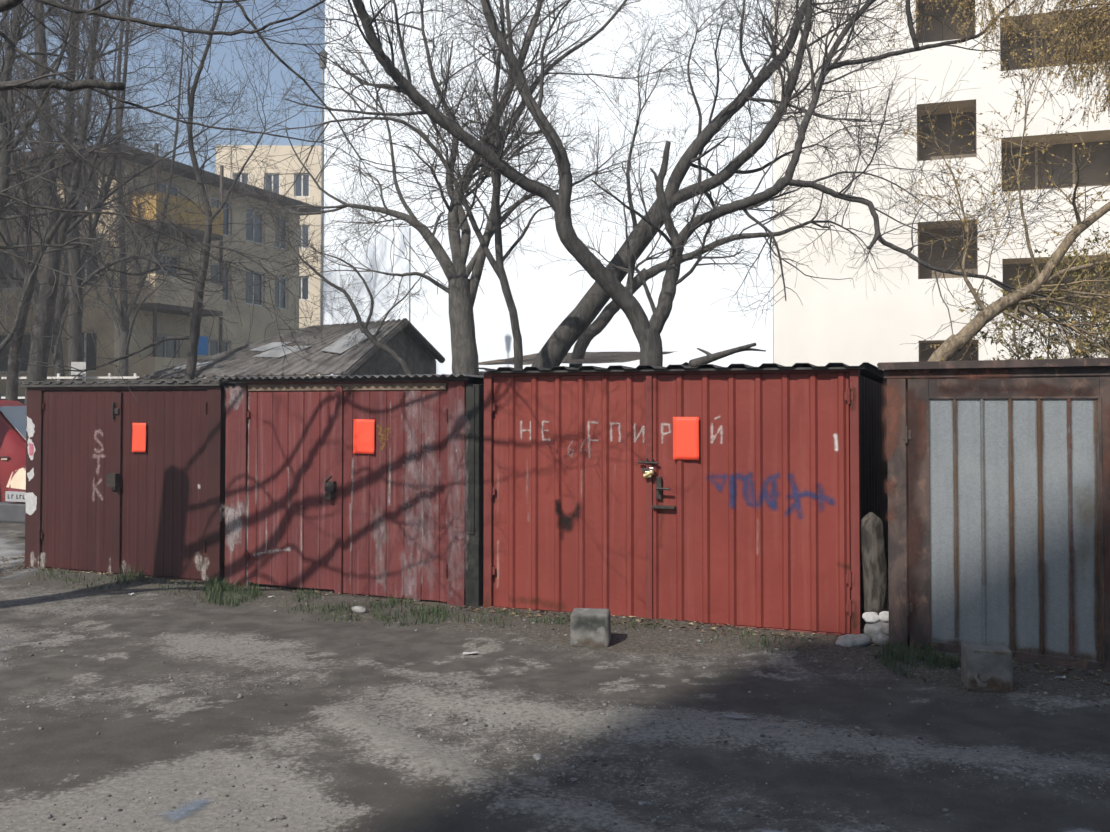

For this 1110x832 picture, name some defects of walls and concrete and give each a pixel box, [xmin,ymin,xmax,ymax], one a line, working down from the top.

peeling [195,554,210,582]
peeling [225,505,242,552]
peeling [402,390,431,601]
corrosion [884,368,1102,662]